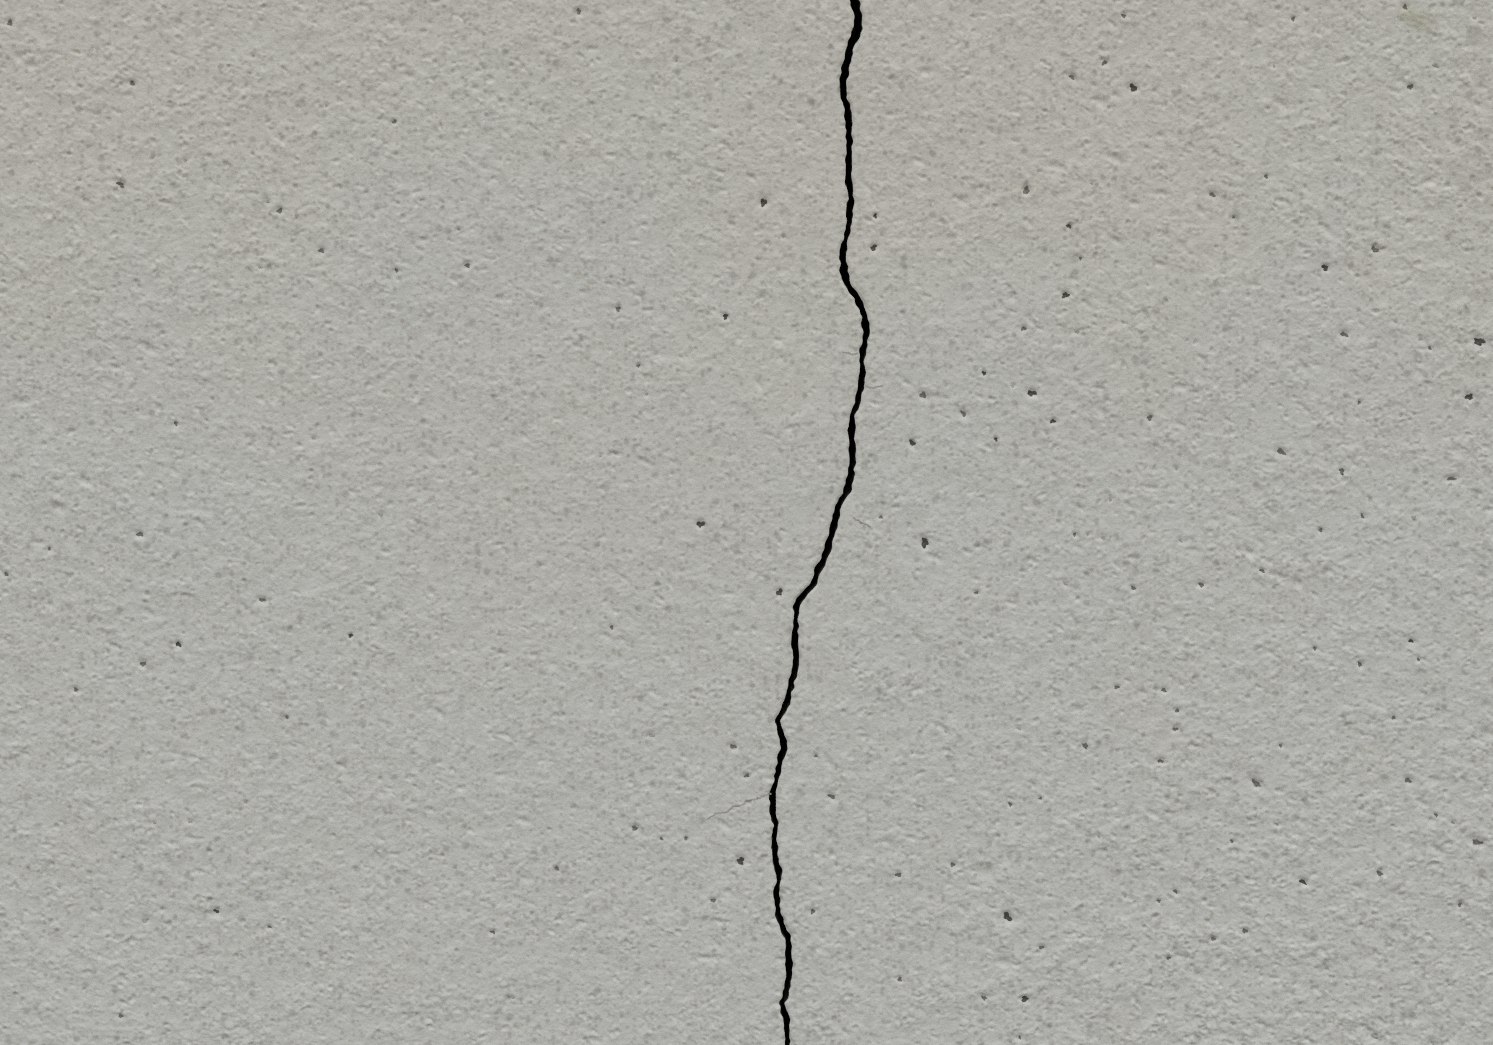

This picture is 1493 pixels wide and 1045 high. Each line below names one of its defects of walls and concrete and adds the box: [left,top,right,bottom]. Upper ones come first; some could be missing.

crack [707,0,884,1045]